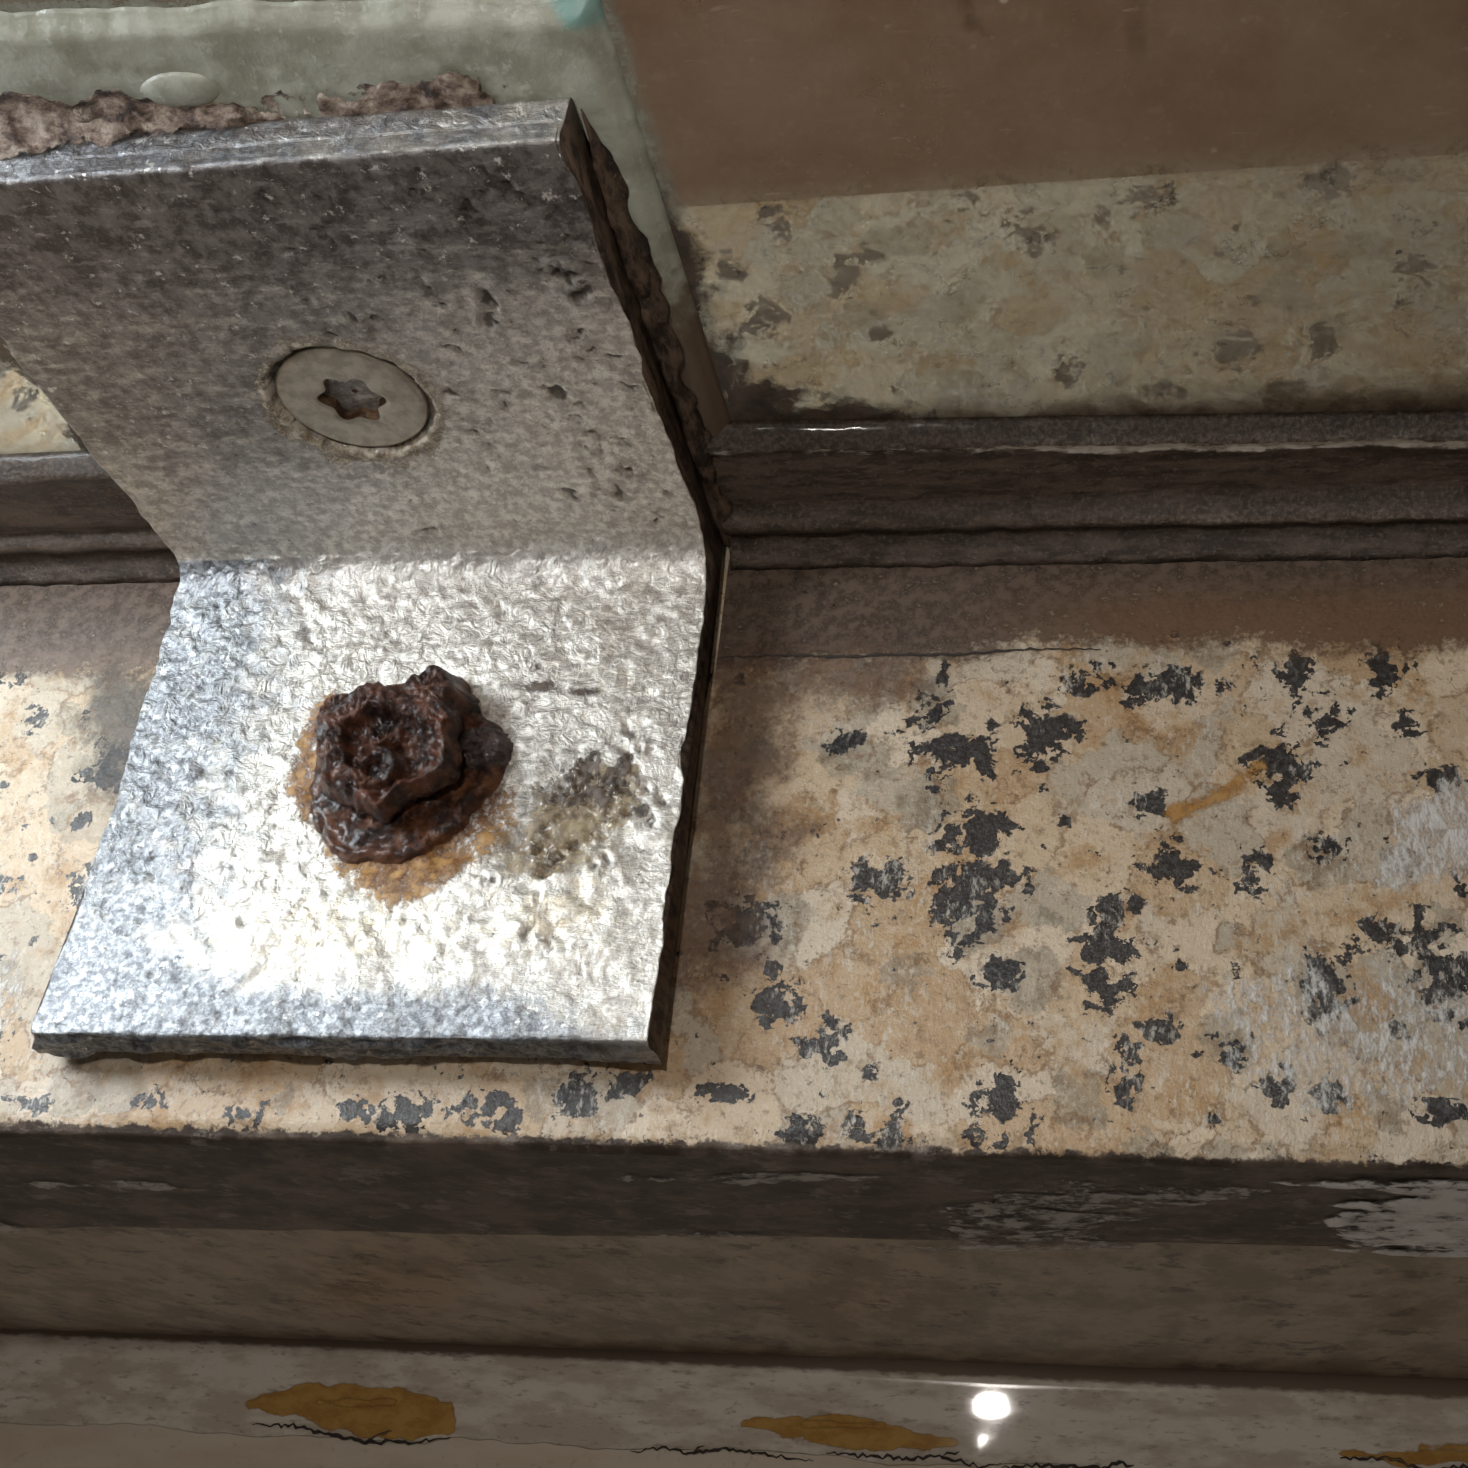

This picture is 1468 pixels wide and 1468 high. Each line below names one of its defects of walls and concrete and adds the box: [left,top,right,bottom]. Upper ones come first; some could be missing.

peeling [317,69,494,117]
peeling [69,107,286,136]
water stain [675,557,1468,989]
corrosion [284,665,649,912]
peeling [1273,1181,1454,1189]
peeling [1332,1249,1468,1258]
corrosion [245,1382,456,1441]
corrosion [741,1414,958,1451]
crack [630,1446,1134,1468]
corrosion [1340,1443,1468,1468]
crack [1340,1455,1468,1468]